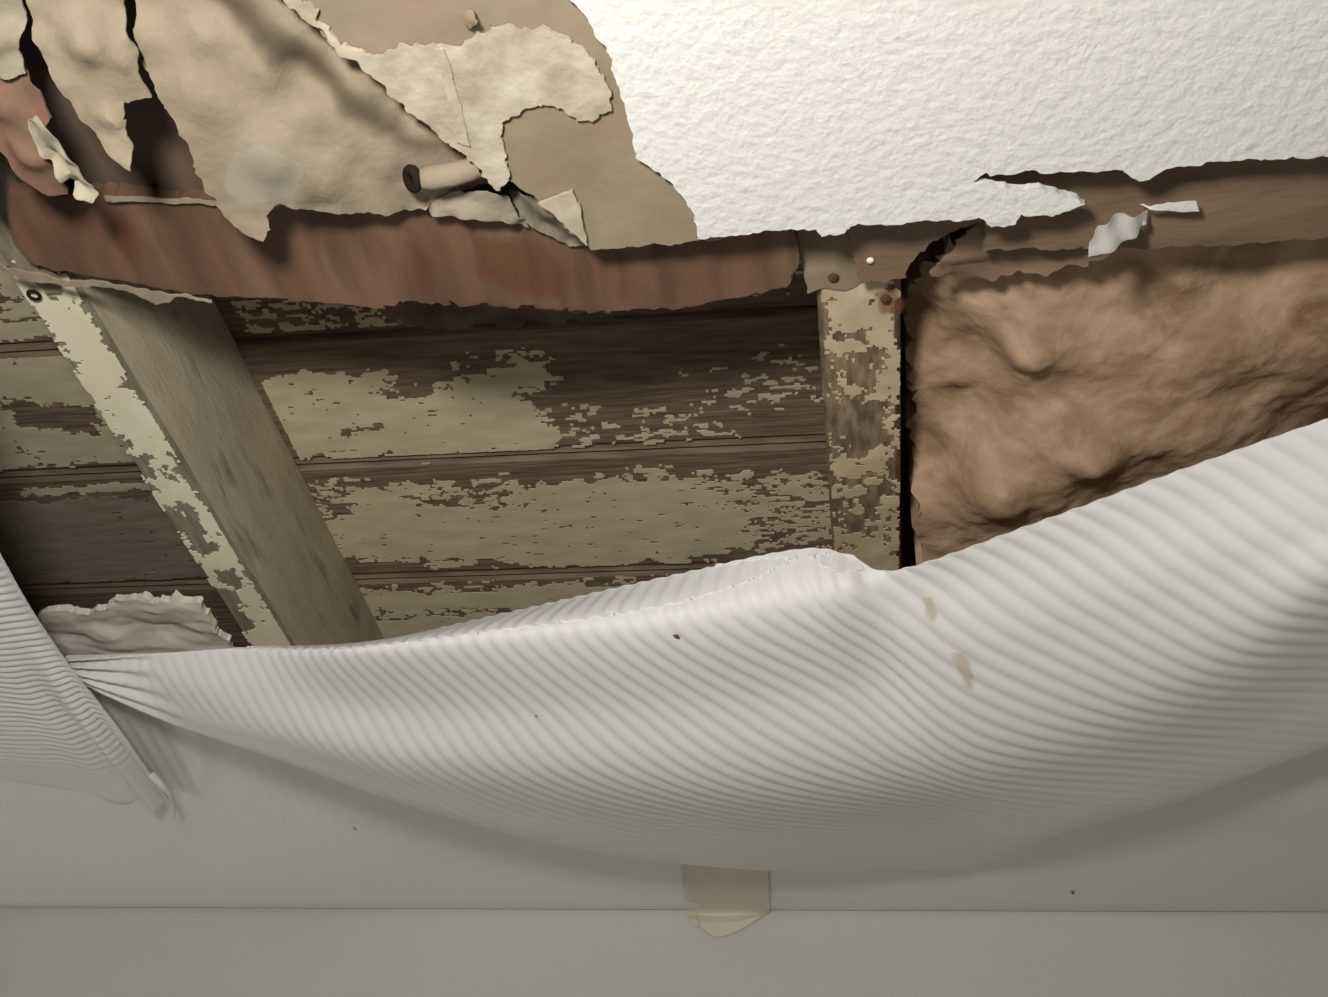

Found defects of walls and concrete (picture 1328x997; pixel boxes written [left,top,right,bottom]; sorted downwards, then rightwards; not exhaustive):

leakage [226,144,301,206]
leakage [226,0,396,131]
flaking render [283,0,722,250]
peeling [1088,201,1199,257]
peeling [230,297,401,334]
peeling [0,253,291,646]
peeling [261,280,901,639]